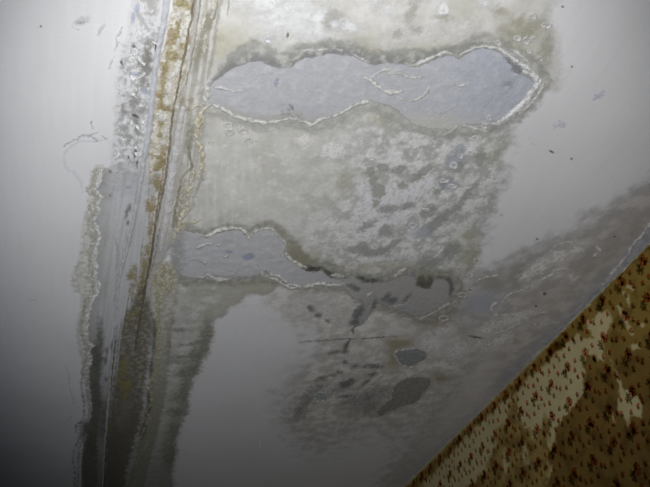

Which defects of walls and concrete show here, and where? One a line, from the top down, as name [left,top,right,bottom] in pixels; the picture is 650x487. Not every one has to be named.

peeling [72,0,170,487]
rust [123,0,194,335]
peeling [168,222,462,327]
leakage [104,0,557,487]
peeling [200,35,551,137]
leakage [382,184,650,487]